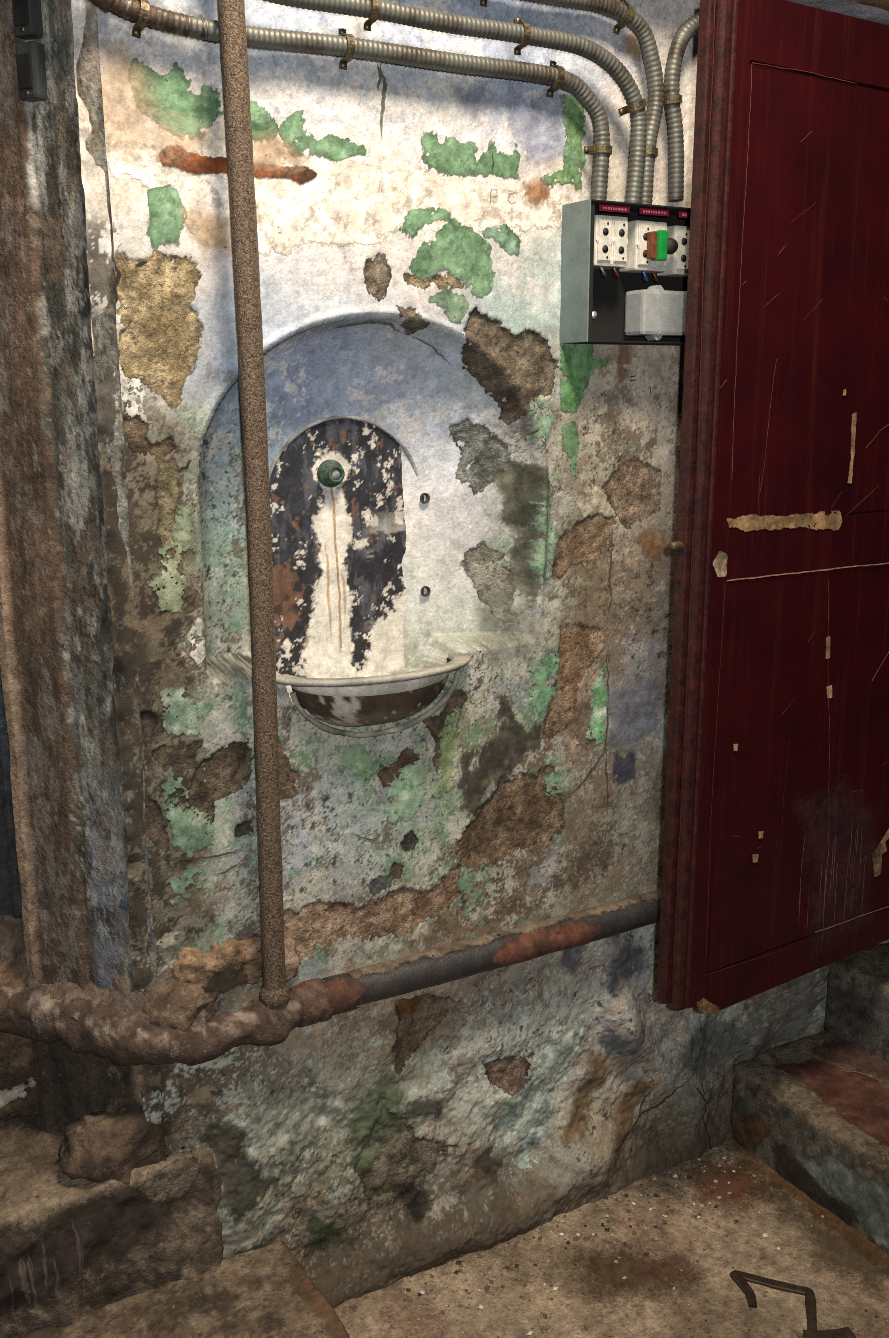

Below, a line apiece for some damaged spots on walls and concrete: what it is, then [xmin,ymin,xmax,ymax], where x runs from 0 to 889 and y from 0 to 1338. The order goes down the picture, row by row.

rust [159,145,228,174]
rust [253,163,317,184]
peeling [250,100,367,161]
peeling [420,94,587,190]
flaking render [107,184,204,409]
flaking render [364,207,662,623]
leakage [508,462,550,560]
flaking render [284,688,568,960]
rust [327,978,366,1016]
rust [397,1000,420,1018]
crack [617,1073,712,1152]
leakage [199,1123,279,1222]